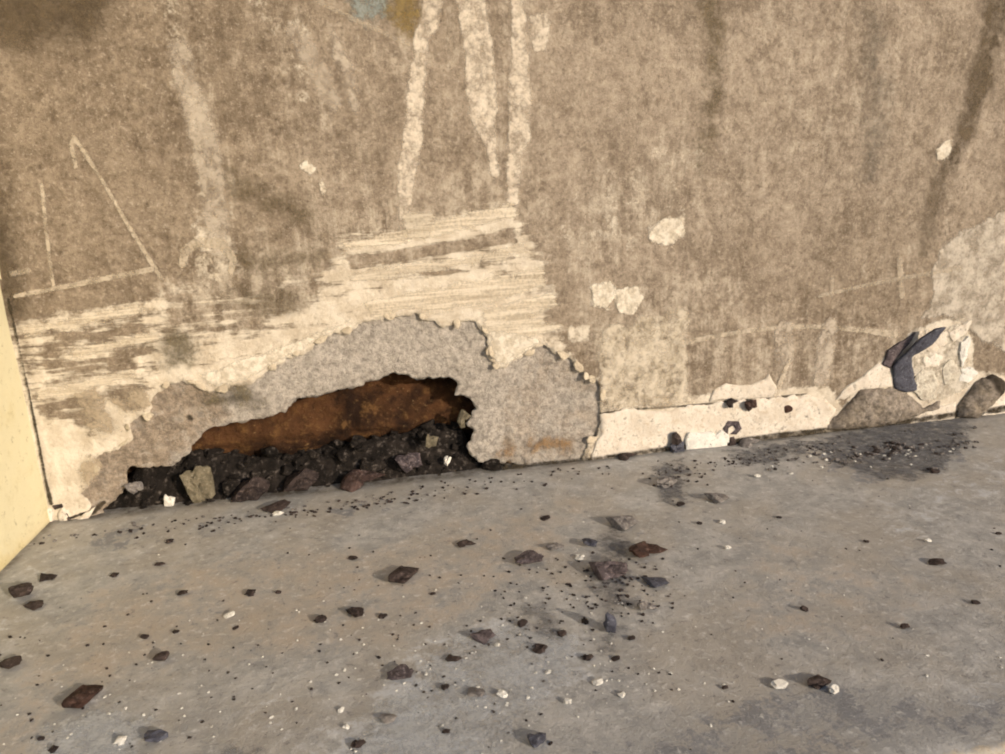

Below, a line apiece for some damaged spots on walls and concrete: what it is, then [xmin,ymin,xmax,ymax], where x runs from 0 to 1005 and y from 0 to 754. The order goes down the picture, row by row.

peeling [341,203,518,254]
peeling [351,243,527,281]
peeling [22,303,147,337]
flaking render [37,269,978,522]
peeling [981,393,1005,416]